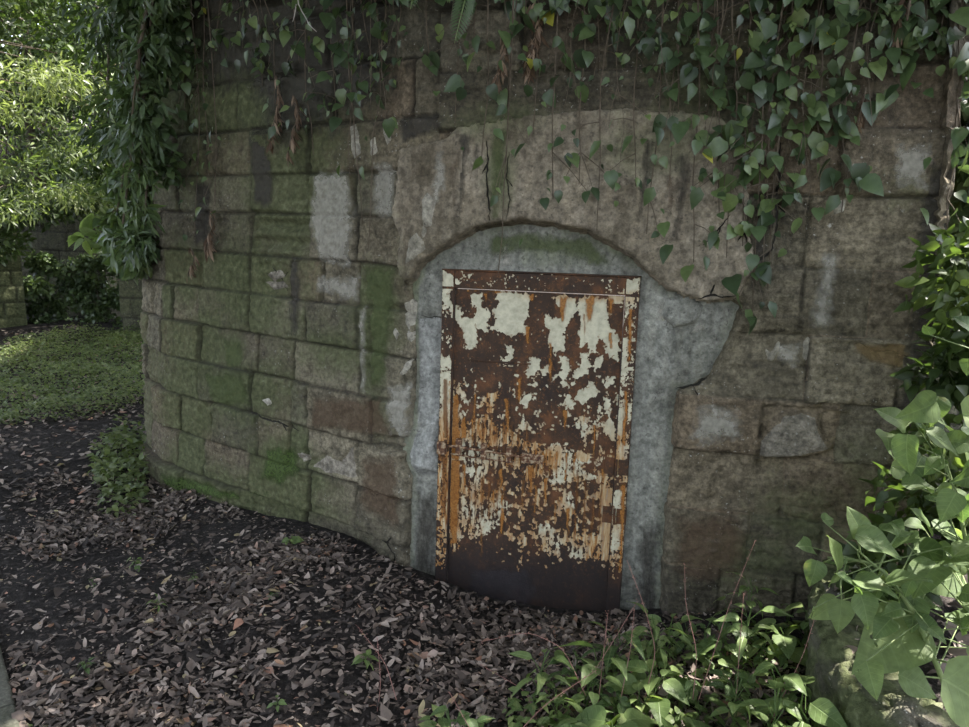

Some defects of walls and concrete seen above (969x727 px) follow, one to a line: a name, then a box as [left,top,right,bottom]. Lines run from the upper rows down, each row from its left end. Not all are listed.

leakage [312,173,350,265]
leakage [375,165,397,215]
leakage [317,269,392,384]
corrosion [583,296,595,331]
peeling [393,270,640,579]
corrosion [442,377,604,544]